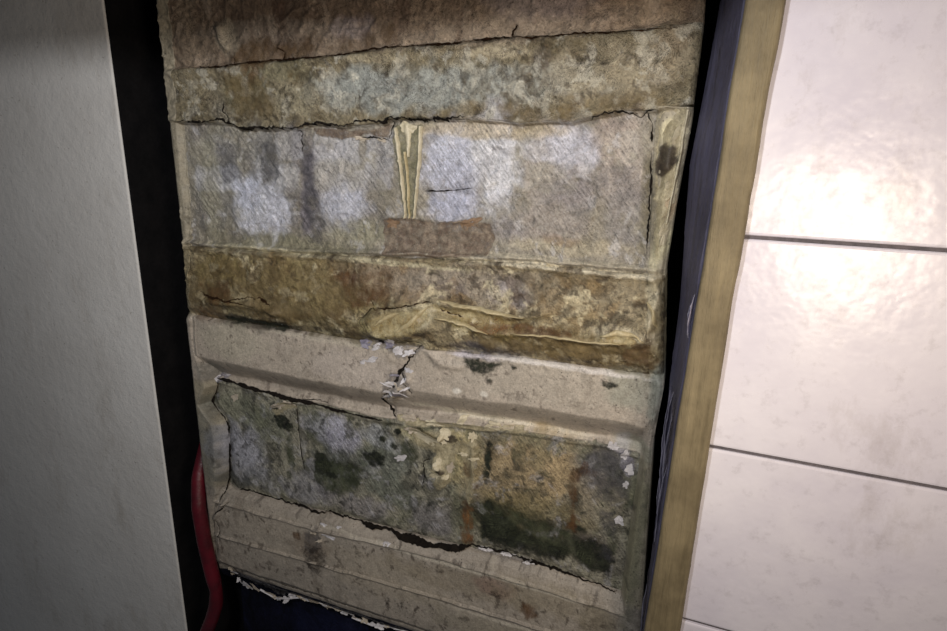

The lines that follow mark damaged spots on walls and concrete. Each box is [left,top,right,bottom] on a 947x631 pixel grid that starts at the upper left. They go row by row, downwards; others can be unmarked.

crack [181,25,678,69]
crack [178,103,464,149]
crack [200,291,270,308]
water stain [273,407,295,478]
water stain [314,429,418,495]
crack [211,341,615,631]
water stain [483,441,493,478]
water stain [479,500,614,573]
peeling [228,567,408,631]